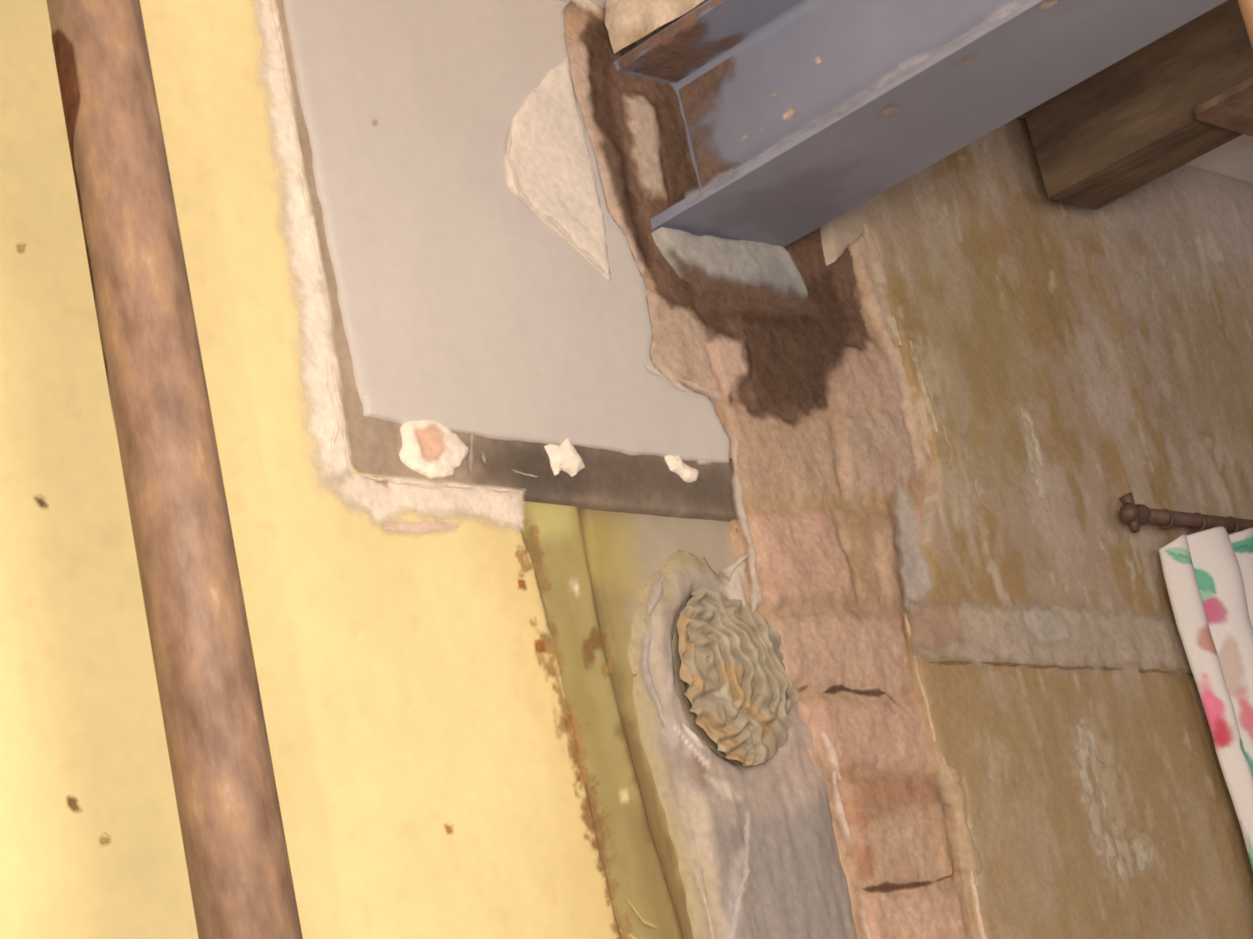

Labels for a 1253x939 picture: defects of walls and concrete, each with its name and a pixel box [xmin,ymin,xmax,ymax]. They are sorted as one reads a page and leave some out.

rust [630,23,739,188]
peeling [256,0,538,534]
spalling [564,0,1088,939]
crack [786,685,893,700]
crack [864,859,954,892]